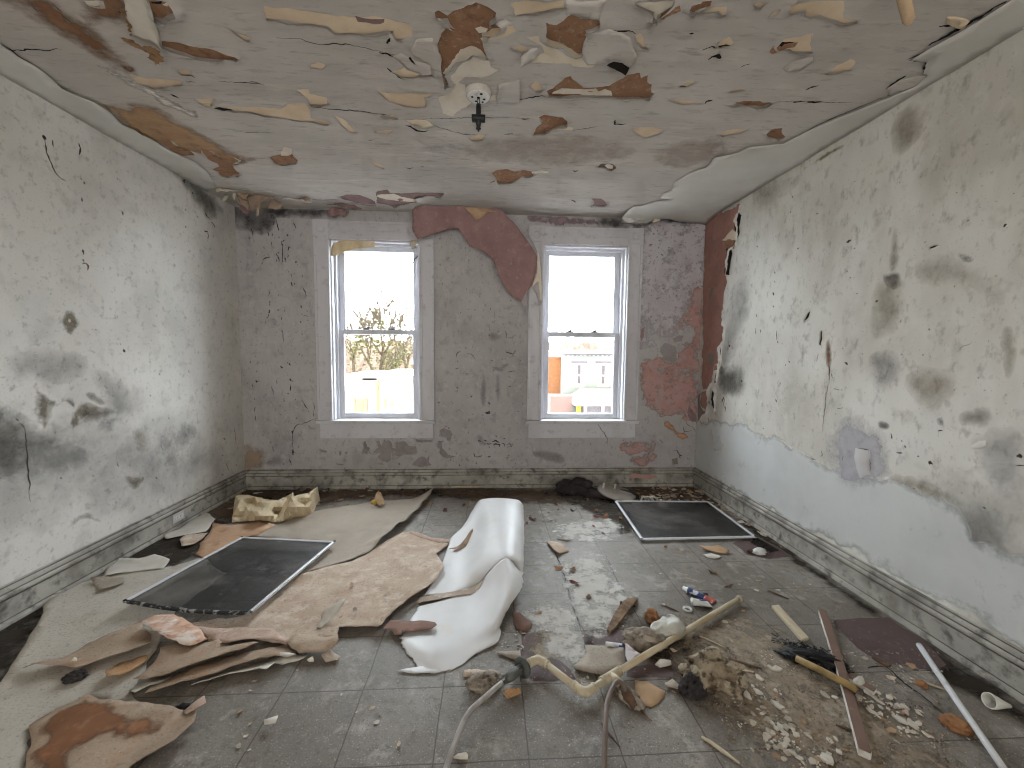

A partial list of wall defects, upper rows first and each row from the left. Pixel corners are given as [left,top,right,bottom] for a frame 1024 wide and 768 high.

peeling [147,0,256,65]
crack [285,38,402,79]
peeling [257,0,700,137]
crack [42,135,85,184]
mould [187,181,214,209]
peeling [335,188,448,209]
peeling [487,167,549,185]
leakage [63,313,77,333]
peeling [686,199,743,424]
leakage [39,395,54,419]
leakage [69,396,107,425]
crack [16,419,31,502]